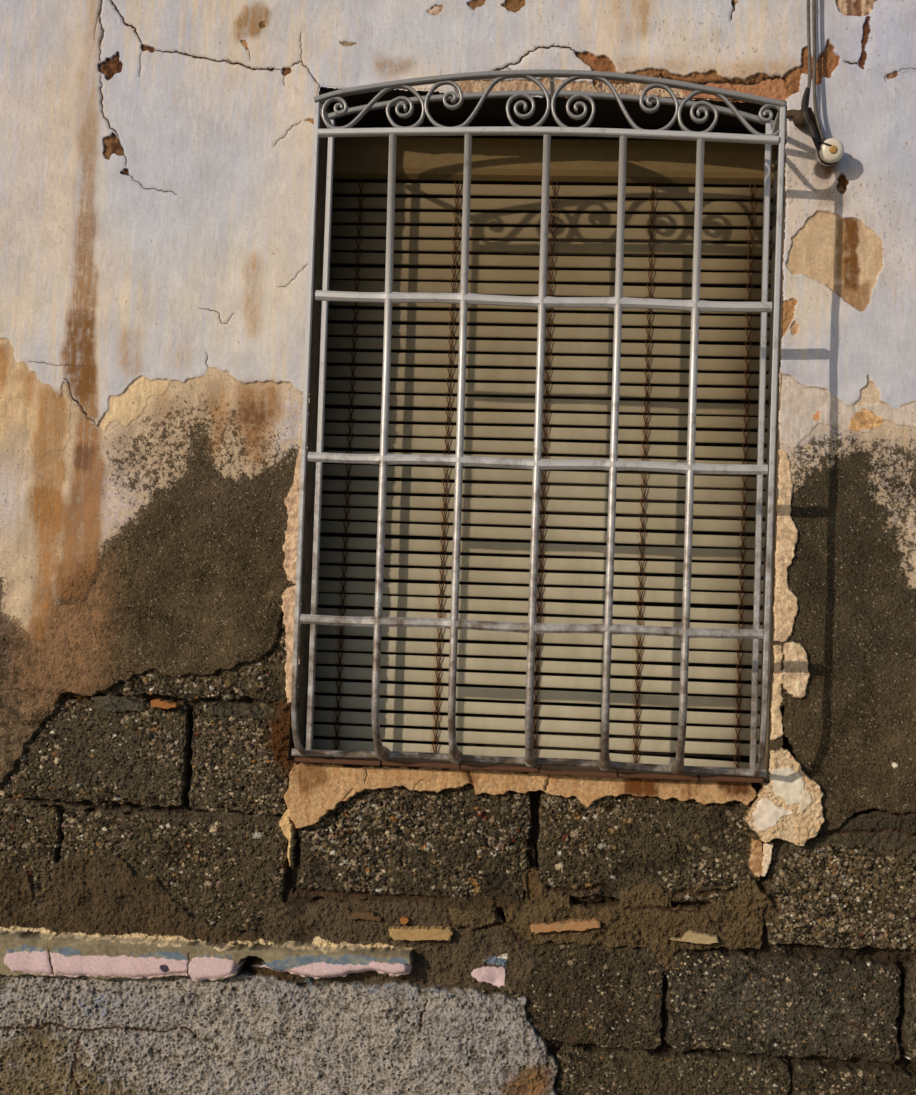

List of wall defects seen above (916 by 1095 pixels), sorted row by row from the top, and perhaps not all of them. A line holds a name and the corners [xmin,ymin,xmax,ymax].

crack [494,45,577,71]
spalling [836,0,877,70]
crack [94,0,320,194]
spalling [837,174,849,195]
damp [28,214,105,691]
damp [239,387,278,461]
peeling [0,338,310,641]
peeling [752,767,812,831]
peeling [0,925,413,982]
peeling [471,956,507,988]